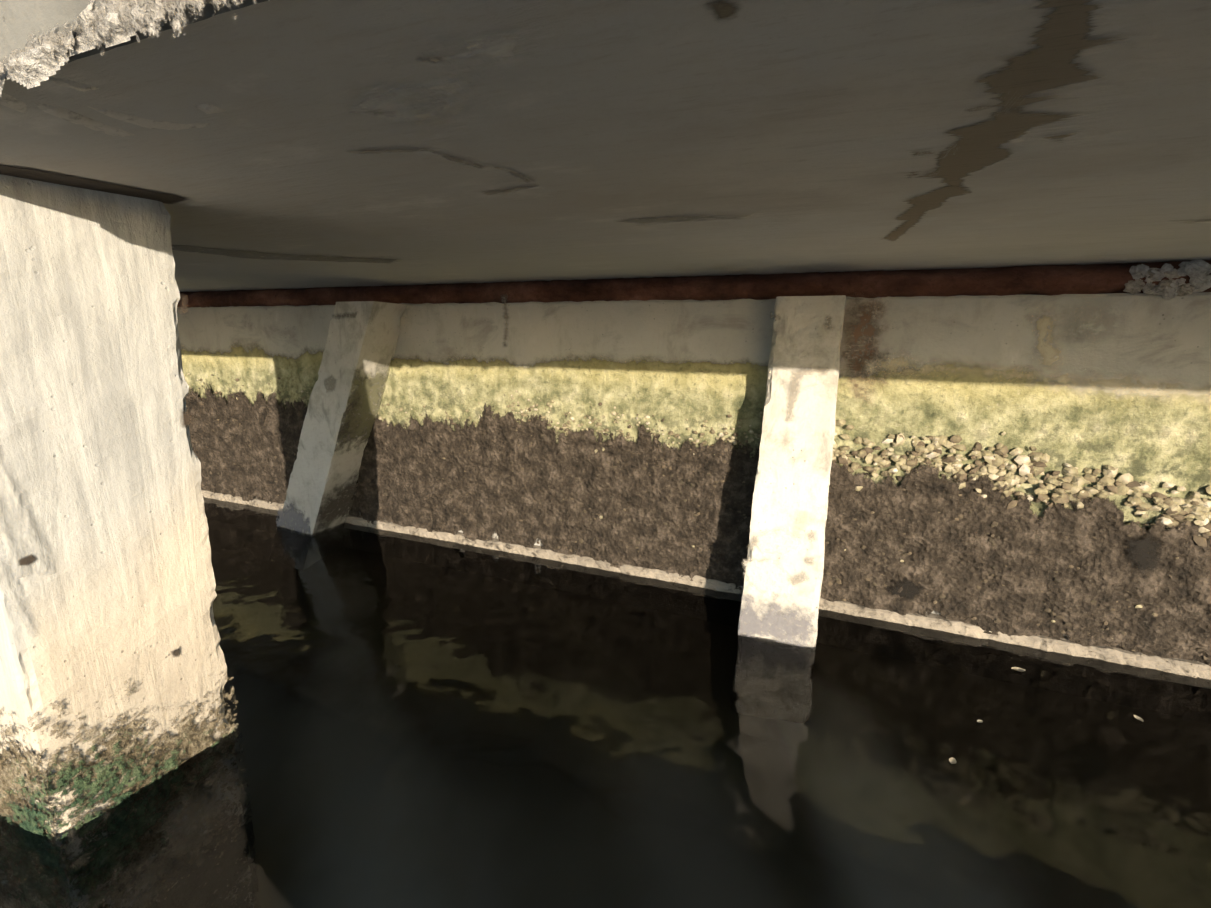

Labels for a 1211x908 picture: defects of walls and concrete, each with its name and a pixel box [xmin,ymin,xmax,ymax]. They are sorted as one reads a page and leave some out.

spalling [0,0,255,97]
leakage [885,0,1122,241]
rust [842,303,883,395]
leakage [276,504,311,534]
leakage [738,596,813,648]